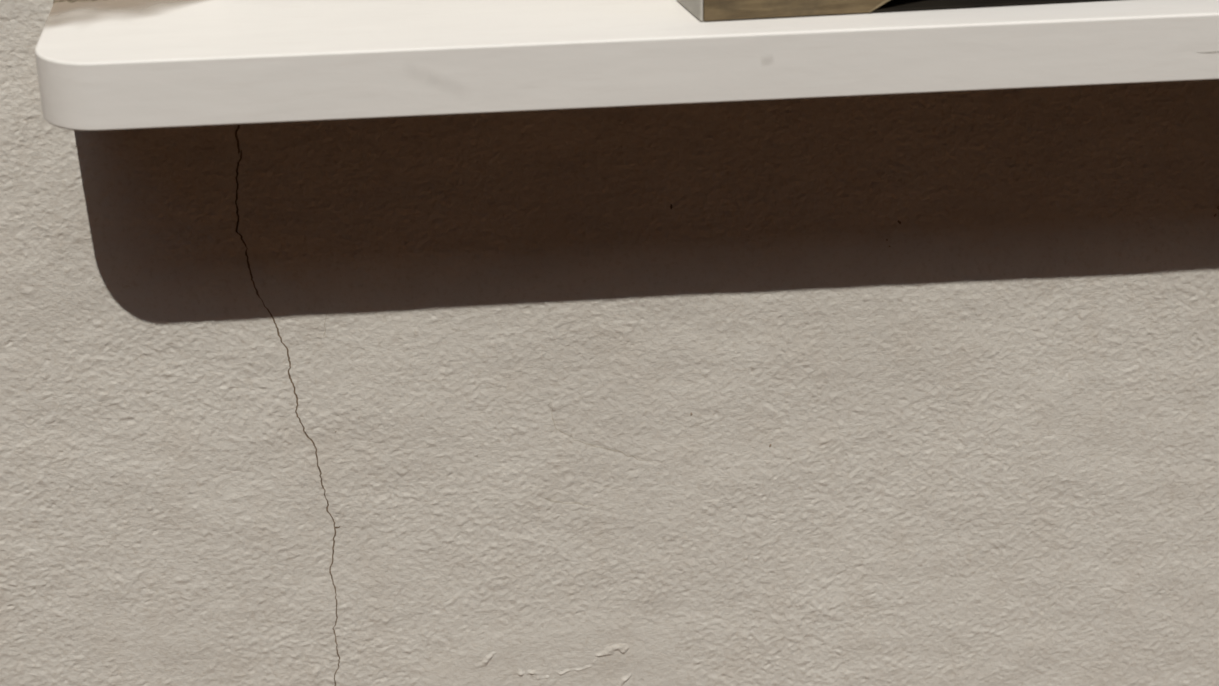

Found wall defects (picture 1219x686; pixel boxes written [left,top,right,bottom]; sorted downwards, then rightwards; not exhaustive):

crack [235,125,340,686]